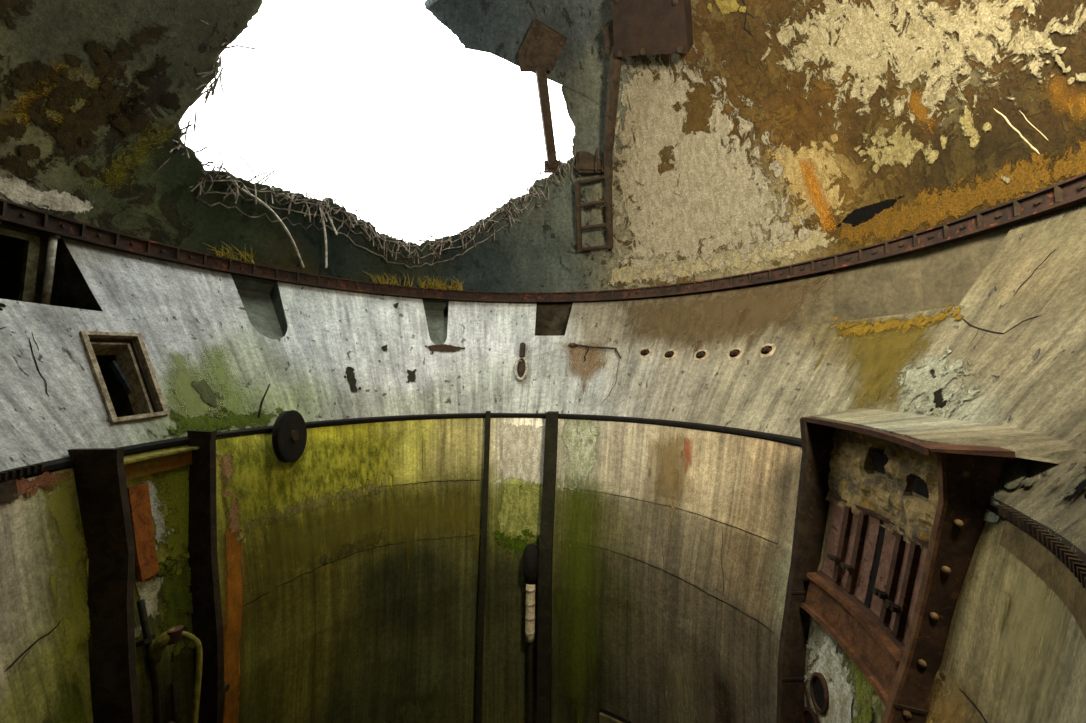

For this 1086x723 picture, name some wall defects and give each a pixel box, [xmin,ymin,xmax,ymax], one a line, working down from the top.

peeling [0,19,582,268]
peeling [596,0,1086,287]
rust [800,137,1086,248]
rust [566,343,605,392]
water stain [263,460,481,610]
spalling [825,428,938,551]
peeling [983,496,1000,523]
peeling [998,457,1036,489]
crack [959,689,988,723]